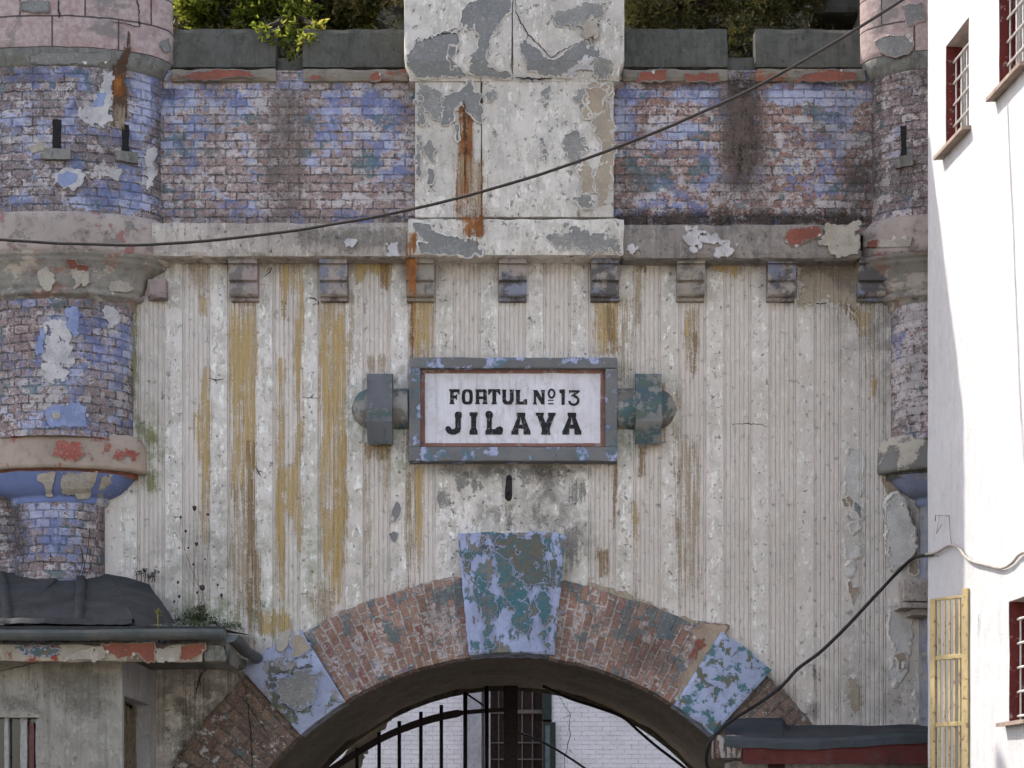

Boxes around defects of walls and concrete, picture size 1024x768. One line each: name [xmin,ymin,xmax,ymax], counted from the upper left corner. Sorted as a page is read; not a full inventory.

corrosion [110,31,131,129]
flaking render [406,0,513,186]
flaking render [519,1,617,210]
corrosion [453,103,488,242]
flaking render [411,221,484,259]
peeling [545,225,623,257]
flaking render [784,225,823,248]
peeling [37,401,113,500]
peeling [113,448,140,461]
peeling [462,531,558,651]
peeling [14,641,207,664]
flaking render [275,627,324,713]